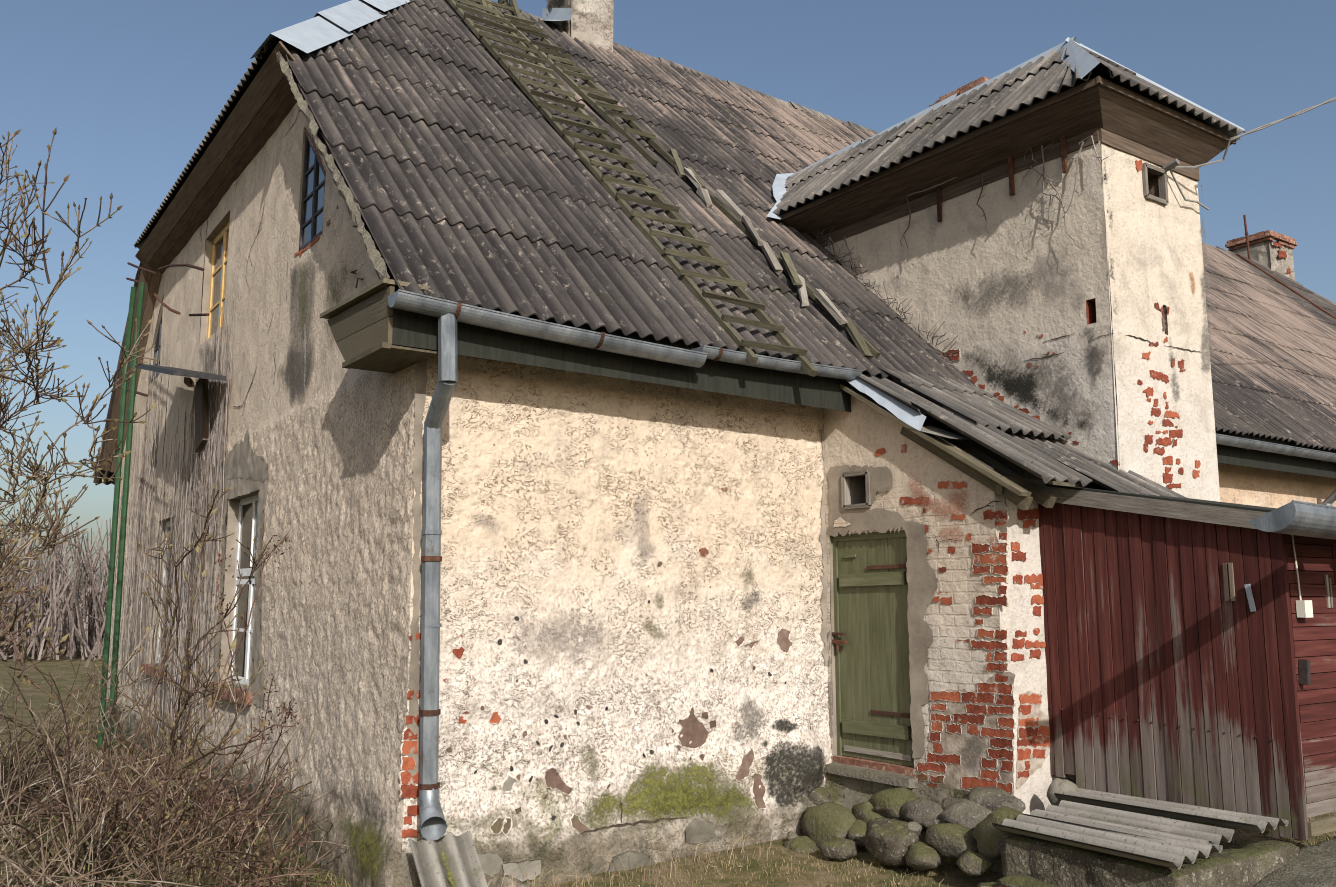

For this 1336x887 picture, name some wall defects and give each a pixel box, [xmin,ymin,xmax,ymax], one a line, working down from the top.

leakage [286,262,345,397]
leakage [960,275,1030,311]
leakage [968,352,1092,427]
leakage [1085,328,1103,386]
spalling [1138,302,1201,489]
spalling [900,480,1050,794]
spalling [399,715,420,838]
spalling [643,705,716,760]
spalling [734,747,767,811]
leakage [737,701,826,806]